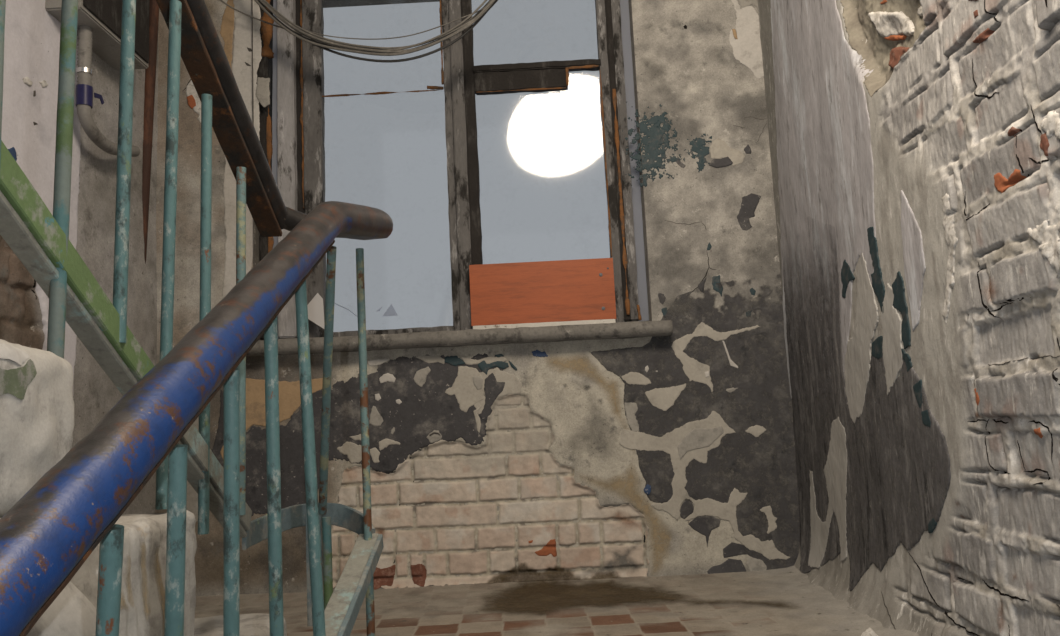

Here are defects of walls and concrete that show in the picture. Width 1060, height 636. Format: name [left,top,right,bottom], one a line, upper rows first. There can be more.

flaking render [1,0,61,216]
flaking render [220,0,270,141]
crack [972,59,999,99]
crack [1015,106,1049,177]
flaking render [222,154,254,298]
flaking render [35,283,49,351]
flaking render [279,0,951,591]
crack [977,262,1031,318]
peeling [246,378,267,516]
crack [967,419,1053,485]
crack [908,552,980,636]
crack [958,577,1028,601]